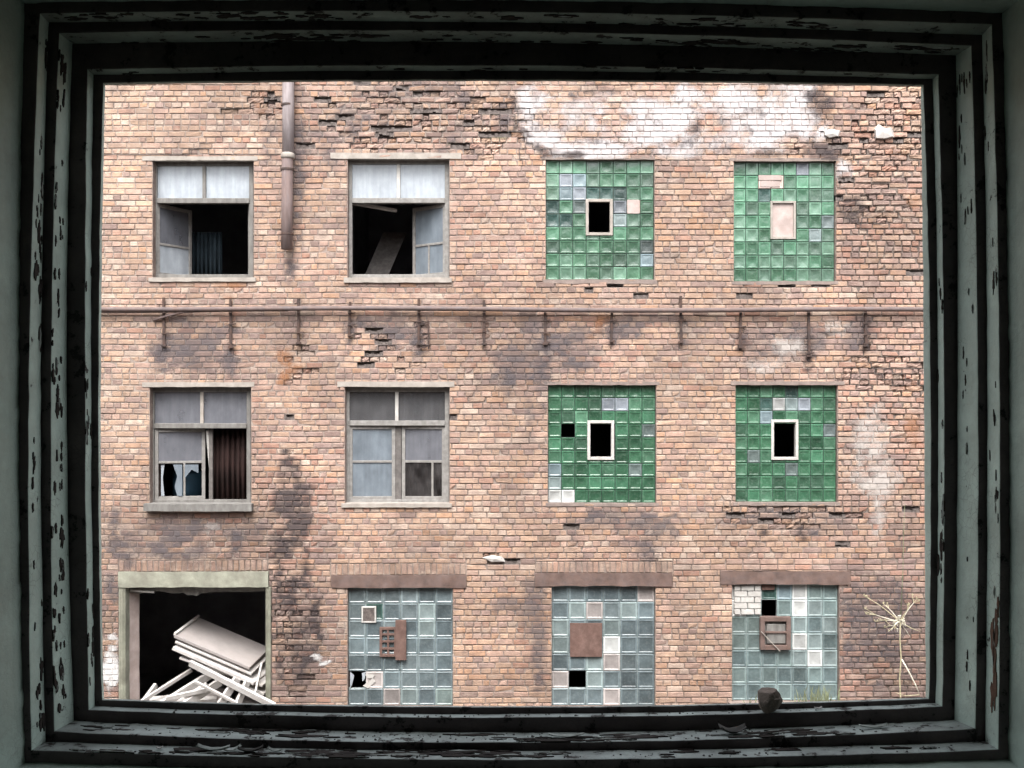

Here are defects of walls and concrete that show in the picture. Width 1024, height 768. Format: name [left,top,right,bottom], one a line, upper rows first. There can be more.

peeling [44,39,67,112]
spalling [314,82,535,160]
spalling [779,86,922,224]
peeling [33,172,64,419]
spalling [354,322,430,374]
peeling [53,441,63,495]
spalling [722,505,862,530]
peeling [36,515,67,732]
water stain [275,548,321,640]
peeling [990,586,1000,713]
peeling [69,728,675,759]
peeling [695,723,898,751]